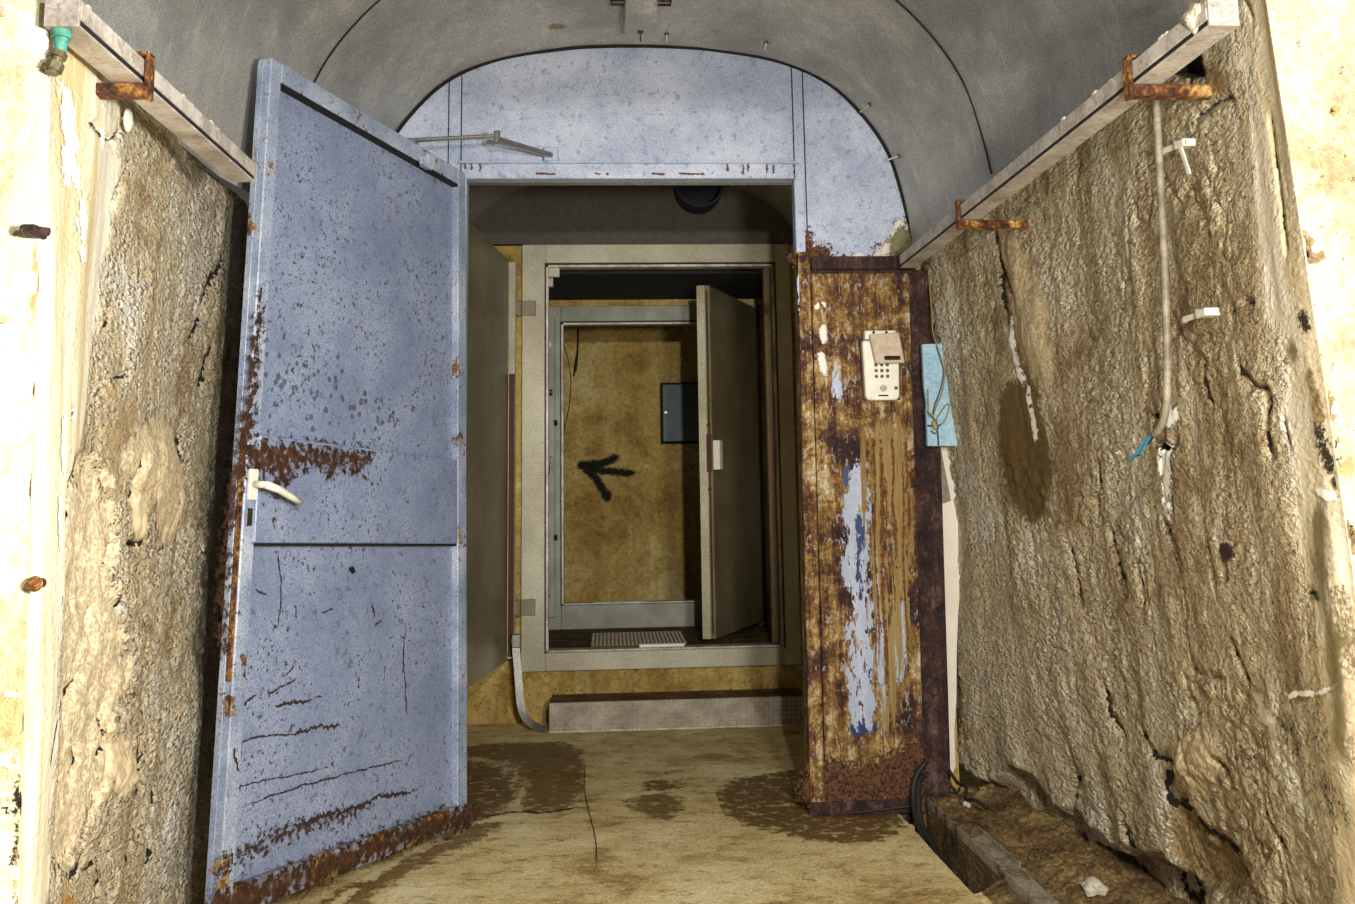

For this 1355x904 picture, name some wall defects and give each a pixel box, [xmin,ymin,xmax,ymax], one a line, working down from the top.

corrosion [212,287,398,660]
peeling [817,324,843,403]
water stain [998,260,1054,528]
crack [1240,364,1290,453]
corrosion [715,415,933,843]
peeling [840,459,910,737]
corrosion [203,800,480,904]
water stain [321,741,586,904]
crack [1106,687,1249,873]
crack [1169,864,1206,904]
crack [1266,810,1288,850]